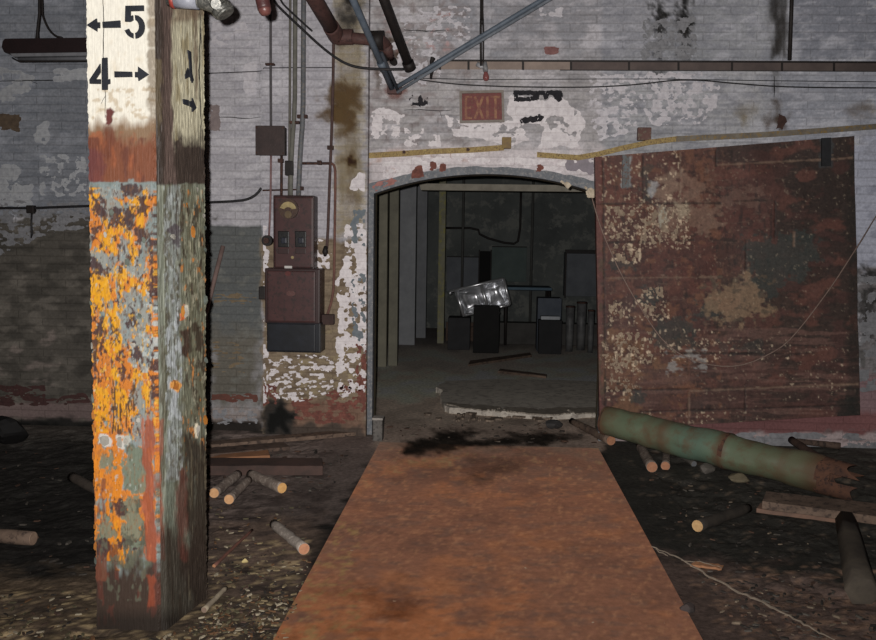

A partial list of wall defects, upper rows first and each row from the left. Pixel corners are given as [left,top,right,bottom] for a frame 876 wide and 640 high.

water stain [654,0,695,51]
water stain [770,0,786,57]
peeling [349,5,721,192]
spalling [776,114,787,130]
peeling [196,209,367,437]
water stain [404,429,572,455]